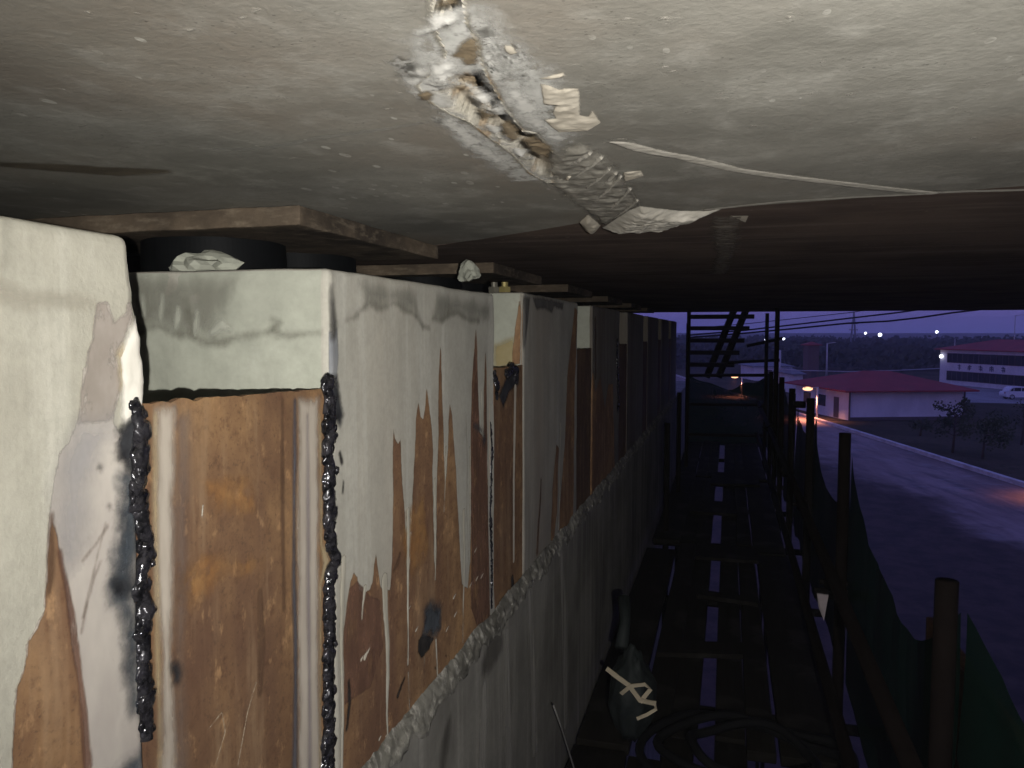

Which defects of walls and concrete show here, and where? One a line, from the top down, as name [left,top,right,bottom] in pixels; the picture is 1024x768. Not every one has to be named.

spalling [416,0,644,234]
crack [609,138,1024,210]
leakage [139,285,217,324]
rust [512,304,523,365]
rust [536,309,577,555]